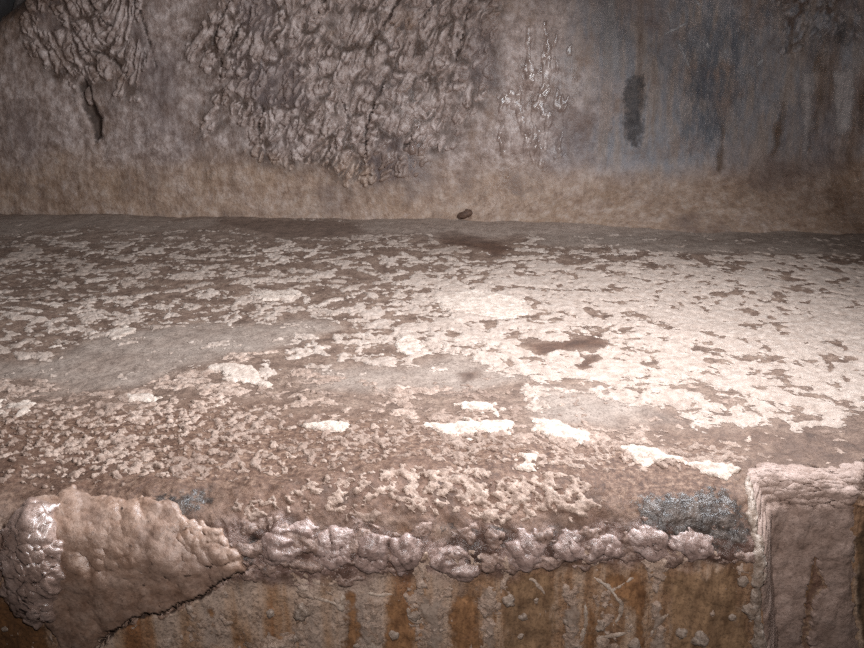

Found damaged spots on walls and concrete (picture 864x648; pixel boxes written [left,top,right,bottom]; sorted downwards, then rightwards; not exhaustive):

water stain [494,21,578,172]
water stain [623,76,644,146]
water stain [834,71,863,133]
peeling [0,220,864,648]
corrosion [0,598,49,648]
corrosion [384,596,415,648]
water stain [502,594,528,621]
corrosion [503,575,556,648]
corrosion [606,573,646,648]
corrosion [665,570,747,648]
water stain [631,460,864,648]
corrosion [856,524,864,640]